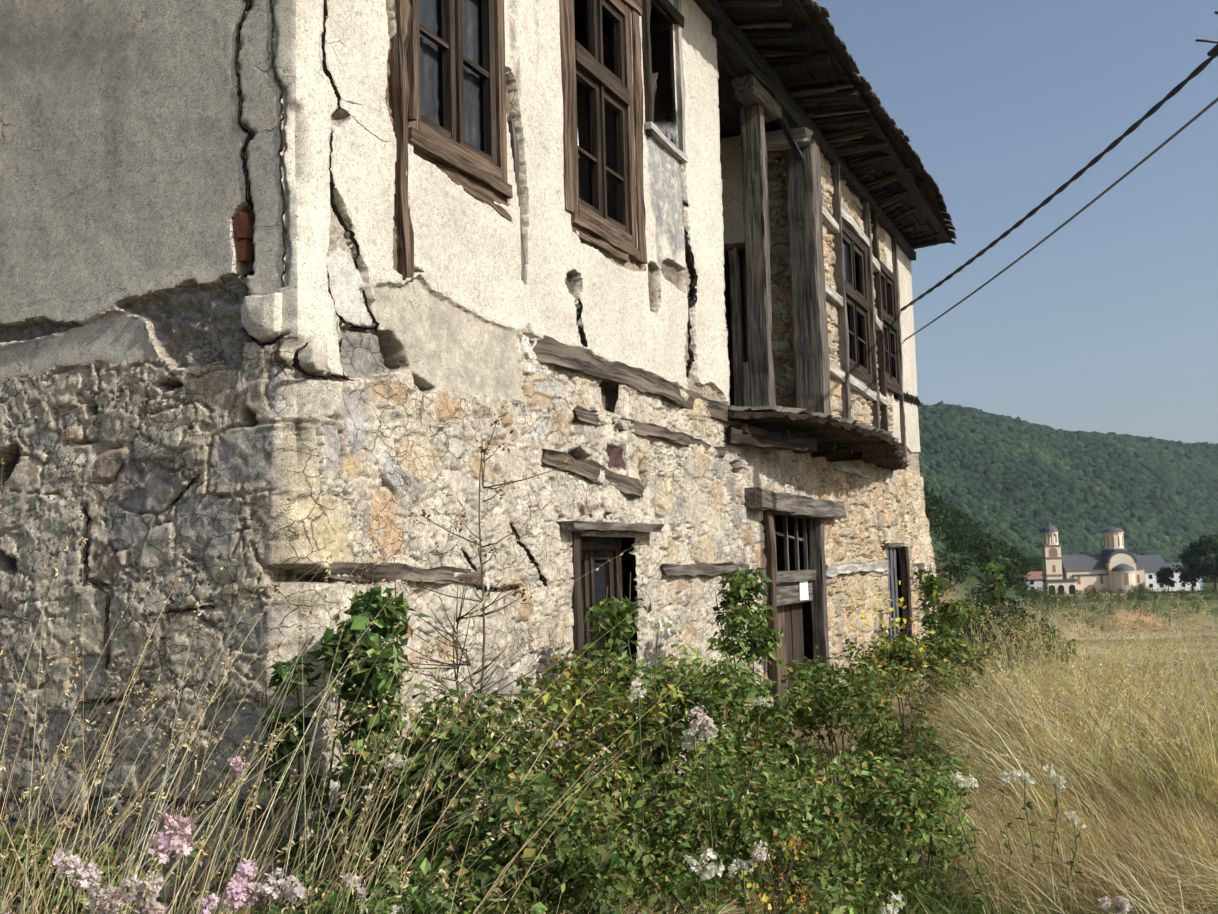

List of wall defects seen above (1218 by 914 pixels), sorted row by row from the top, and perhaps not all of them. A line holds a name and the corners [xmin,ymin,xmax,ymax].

spalling [0,316,83,343]
spalling [114,201,259,371]
crack [235,0,288,296]
crack [250,0,416,381]
spalling [385,0,396,126]
peeling [326,188,595,402]
crack [576,299,588,347]
spalling [580,241,729,405]
crack [669,125,698,378]
spalling [680,163,690,245]
crack [77,506,133,704]
crack [427,492,548,591]